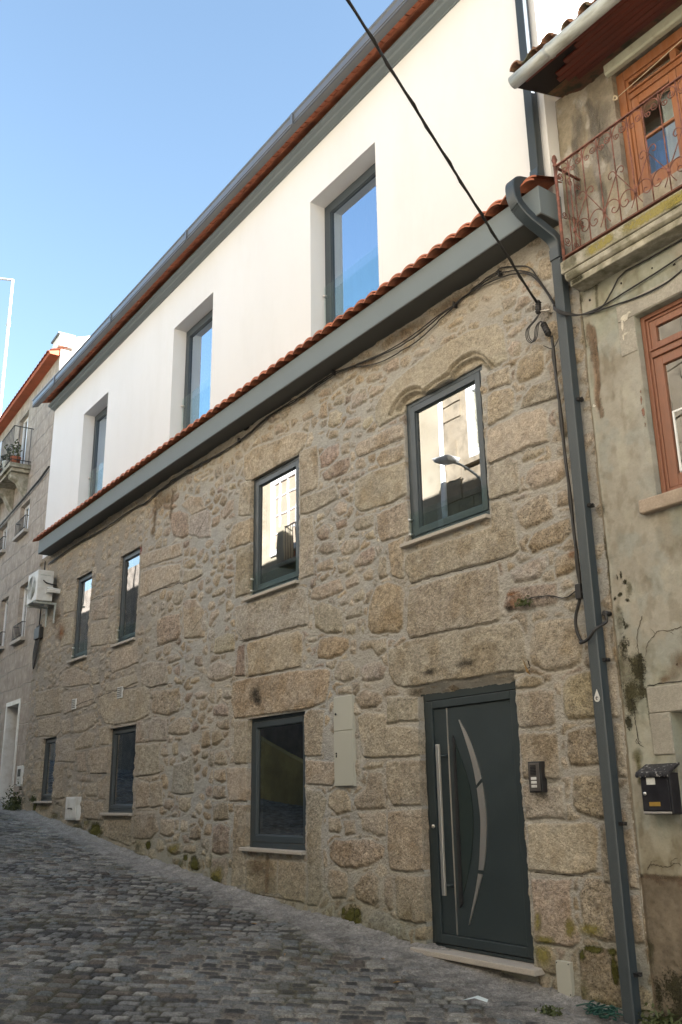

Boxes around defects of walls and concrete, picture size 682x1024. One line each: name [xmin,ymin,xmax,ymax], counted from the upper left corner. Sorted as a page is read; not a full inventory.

damp [605,542,650,731]
crack [628,617,682,747]